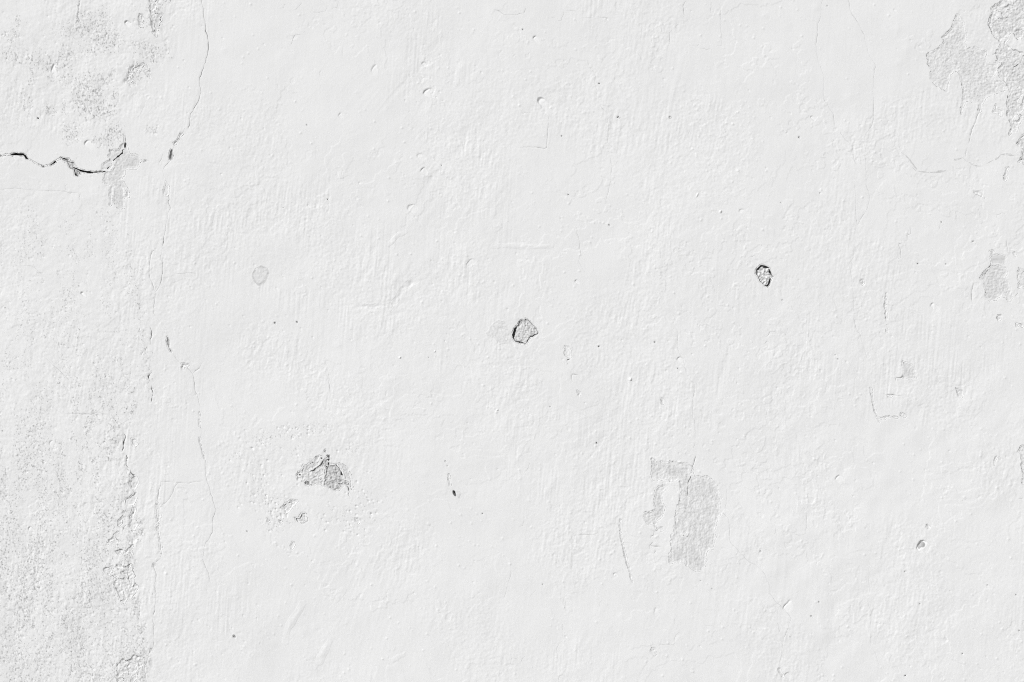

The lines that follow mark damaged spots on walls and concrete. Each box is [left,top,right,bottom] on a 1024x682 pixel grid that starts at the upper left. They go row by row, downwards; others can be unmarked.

crack [0,2,209,197]
peeling [927,0,1024,181]
crack [58,195,216,579]
spalling [511,318,539,345]
spalling [755,264,773,287]
spalling [296,448,353,494]
peeling [643,458,722,573]